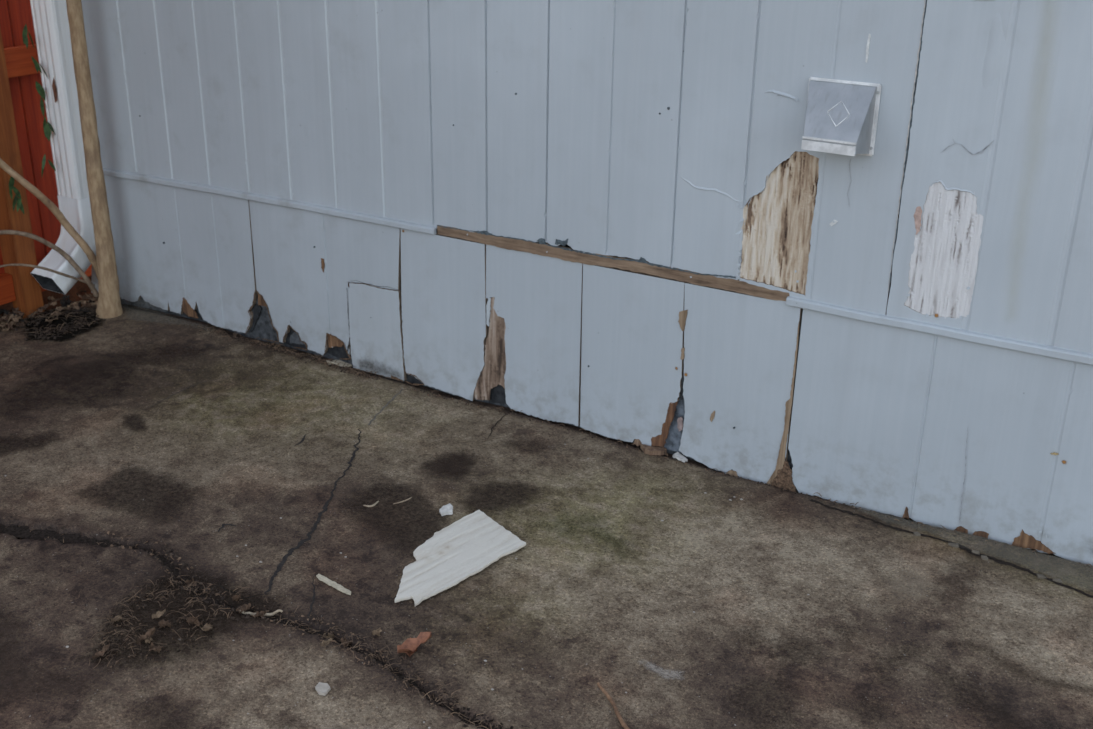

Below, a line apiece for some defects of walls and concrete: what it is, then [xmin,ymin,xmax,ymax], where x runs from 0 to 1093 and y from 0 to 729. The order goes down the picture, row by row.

peeling [437,151,819,294]
peeling [904,180,984,319]
spalling [246,291,308,350]
spalling [325,333,352,361]
peeling [678,310,688,331]
spalling [489,384,506,404]
spalling [664,397,688,462]
peeling [767,323,799,492]
leakage [82,469,194,516]
leakage [465,482,536,511]
crack [0,389,489,729]
peeling [1012,530,1055,554]